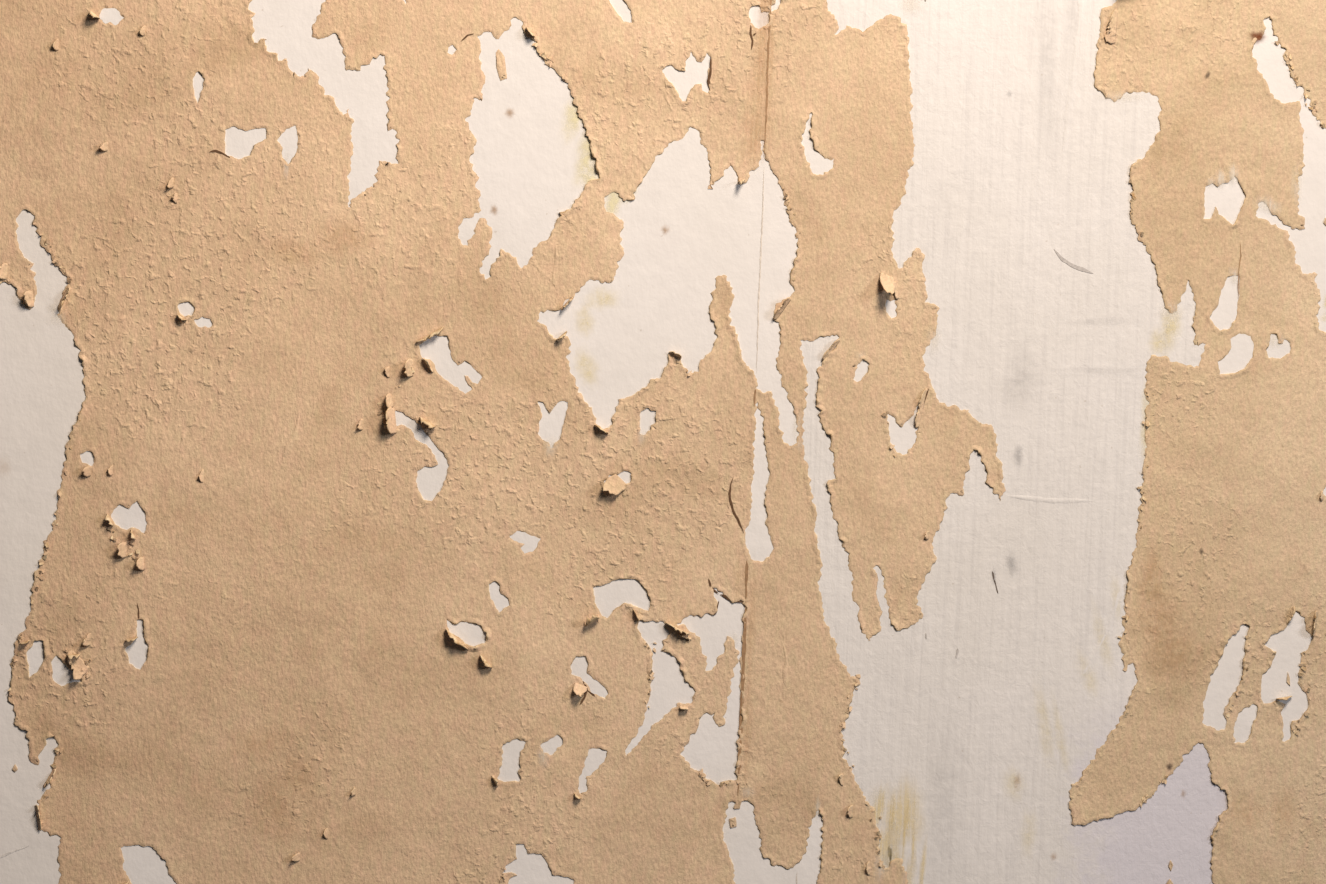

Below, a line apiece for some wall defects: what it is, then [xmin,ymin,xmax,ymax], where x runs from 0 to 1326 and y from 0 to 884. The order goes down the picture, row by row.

peeling [89,4,127,30]
peeling [188,67,210,106]
peeling [243,0,404,210]
peeling [219,121,303,168]
peeling [442,0,1326,884]
peeling [0,204,100,884]
peeling [117,840,182,884]